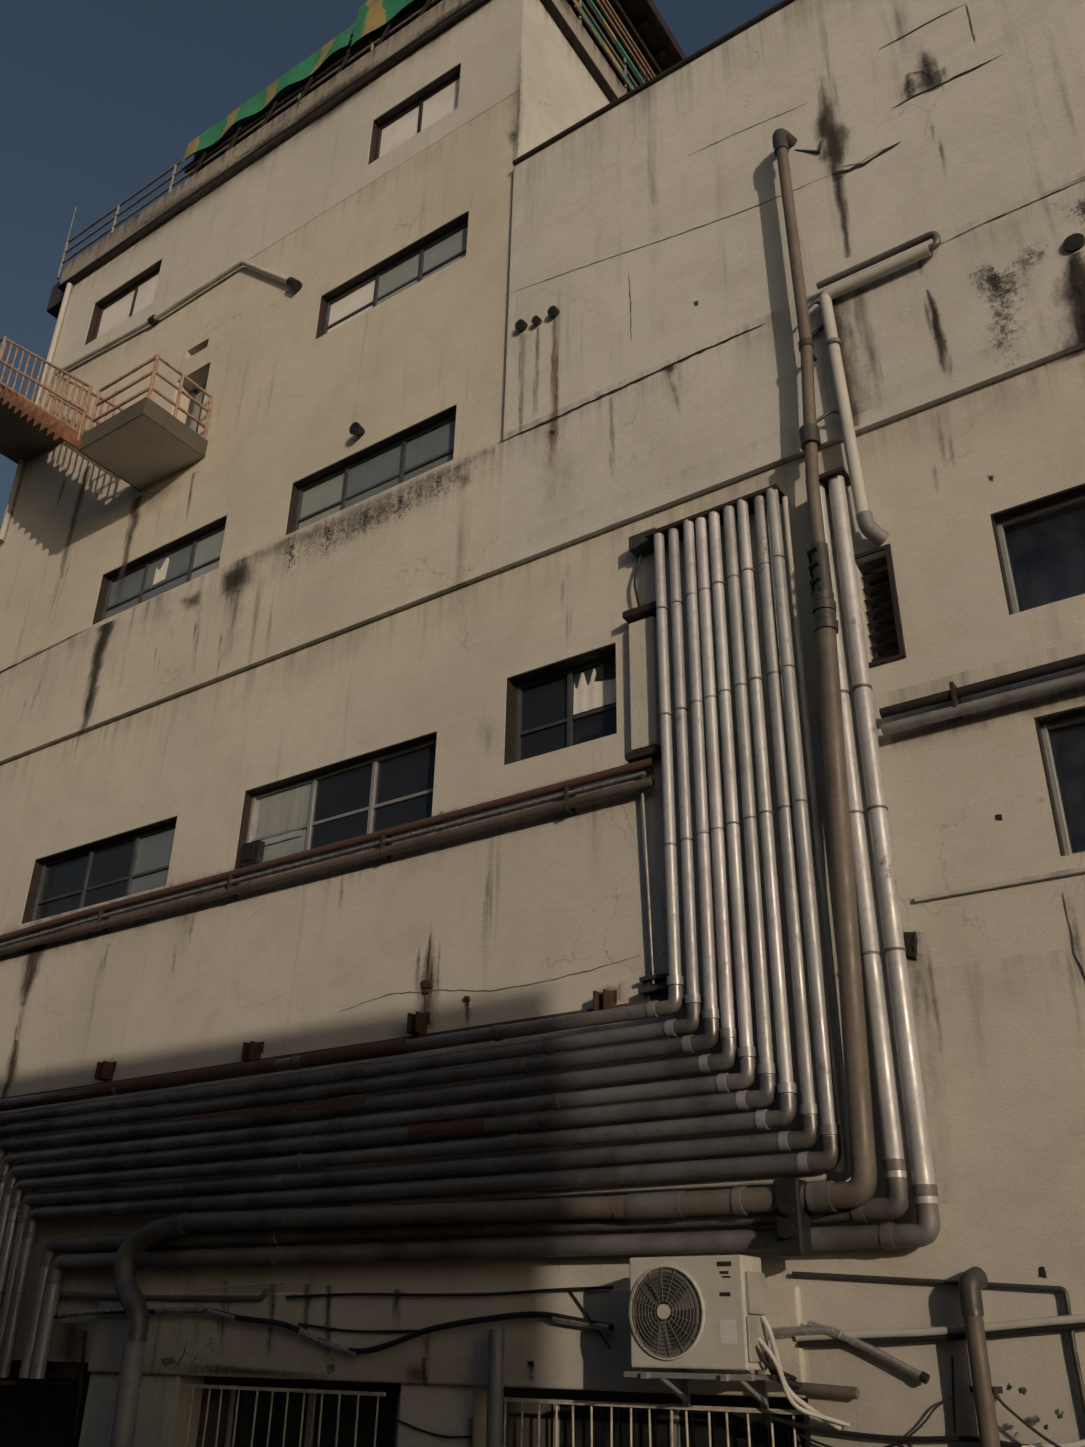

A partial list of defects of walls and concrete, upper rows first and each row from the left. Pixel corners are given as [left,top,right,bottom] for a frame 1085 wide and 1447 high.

water stain [905,54,941,98]
water stain [818,95,849,256]
water stain [927,290,945,363]
water stain [970,250,1044,347]
water stain [1065,252,1085,350]
corrosion [550,318,558,440]
water stain [285,461,471,568]
water stain [224,564,247,592]
water stain [81,620,113,734]